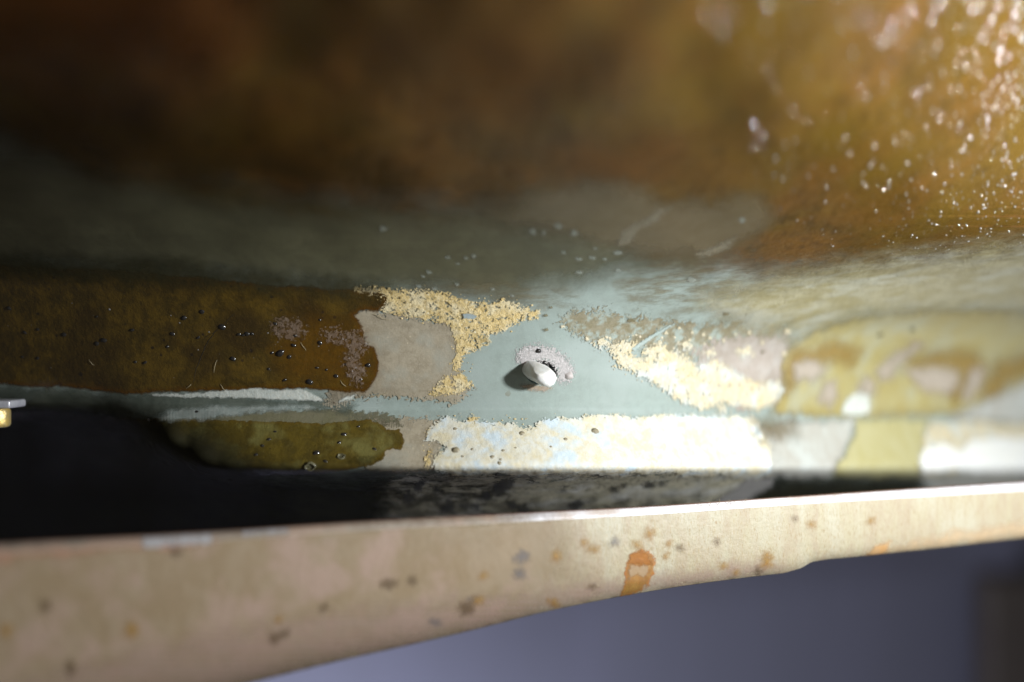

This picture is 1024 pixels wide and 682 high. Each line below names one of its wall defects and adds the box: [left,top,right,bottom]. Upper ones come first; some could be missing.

peeling [354,285,541,397]
damp [0,409,928,563]
peeling [423,334,855,501]
corrosion [620,543,669,597]